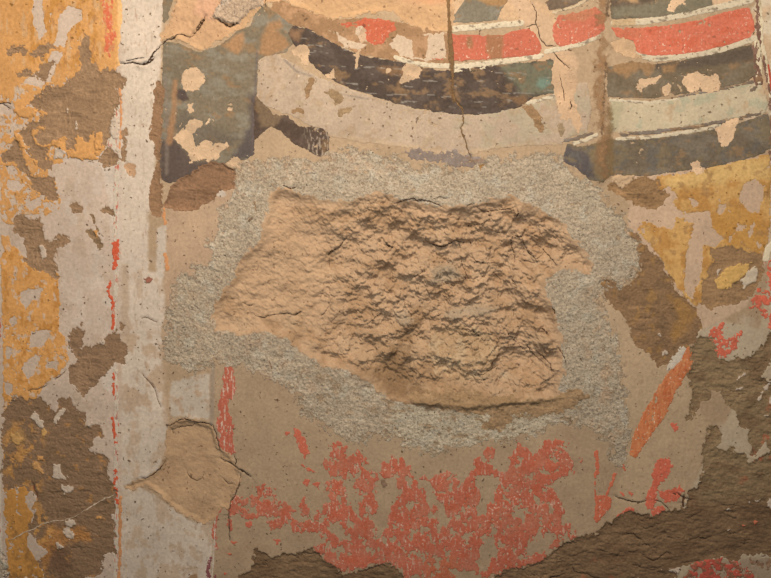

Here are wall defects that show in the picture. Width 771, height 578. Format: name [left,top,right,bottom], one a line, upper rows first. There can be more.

peeling [1,34,137,201]
crack [122,18,239,65]
crack [453,95,471,157]
spalling [210,186,594,433]
peeling [0,321,242,578]
peeling [494,232,771,578]
peeling [238,547,405,578]